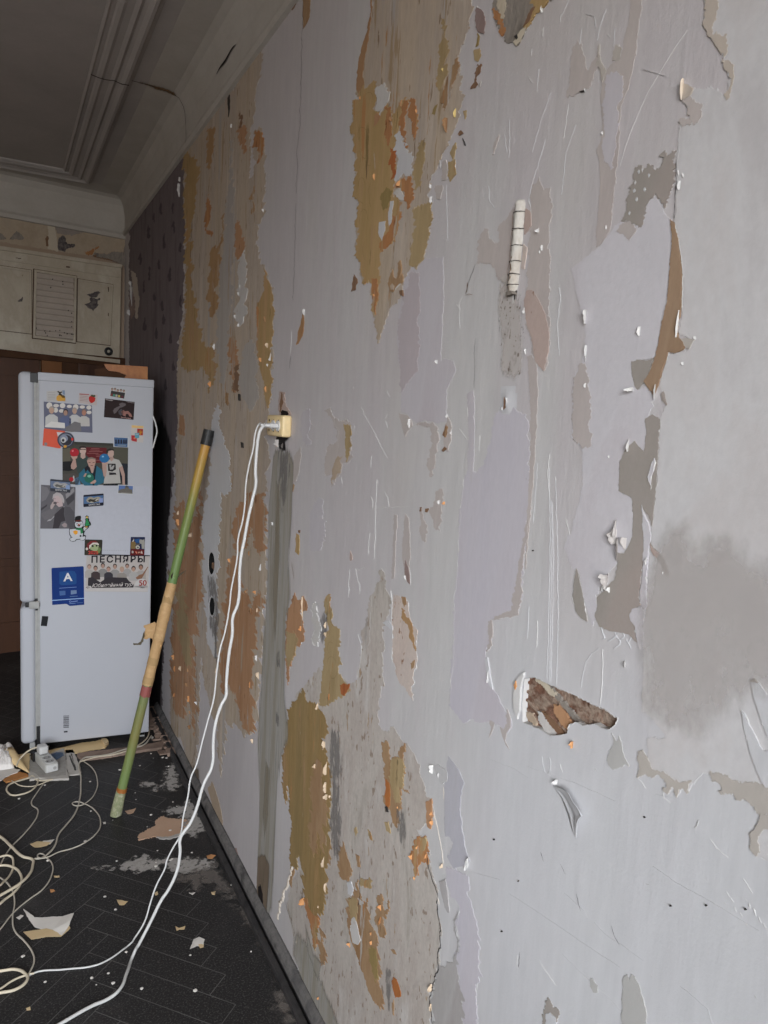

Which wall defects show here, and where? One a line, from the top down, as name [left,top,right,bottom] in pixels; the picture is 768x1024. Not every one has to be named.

crack [91,74,186,142]
peeling [349,0,482,344]
spalling [492,0,552,46]
peeling [621,150,684,228]
peeling [169,50,291,777]
peeling [572,414,661,649]
damp [258,449,293,912]
peeling [281,489,483,1024]
spalling [513,672,629,770]